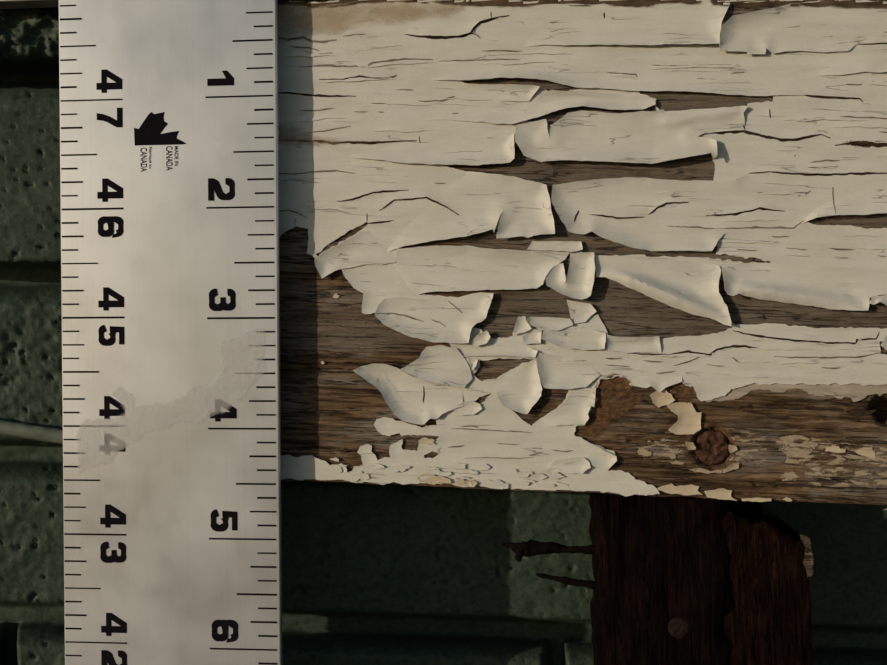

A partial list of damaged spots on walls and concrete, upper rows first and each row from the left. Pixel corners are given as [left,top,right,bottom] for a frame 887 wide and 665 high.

peeling [523,1,887,55]
peeling [314,66,887,426]
peeling [331,458,370,482]
peeling [418,440,617,489]
rust [684,424,736,470]
peeling [704,488,772,502]
peeling [781,472,799,481]
peeling [810,466,851,489]